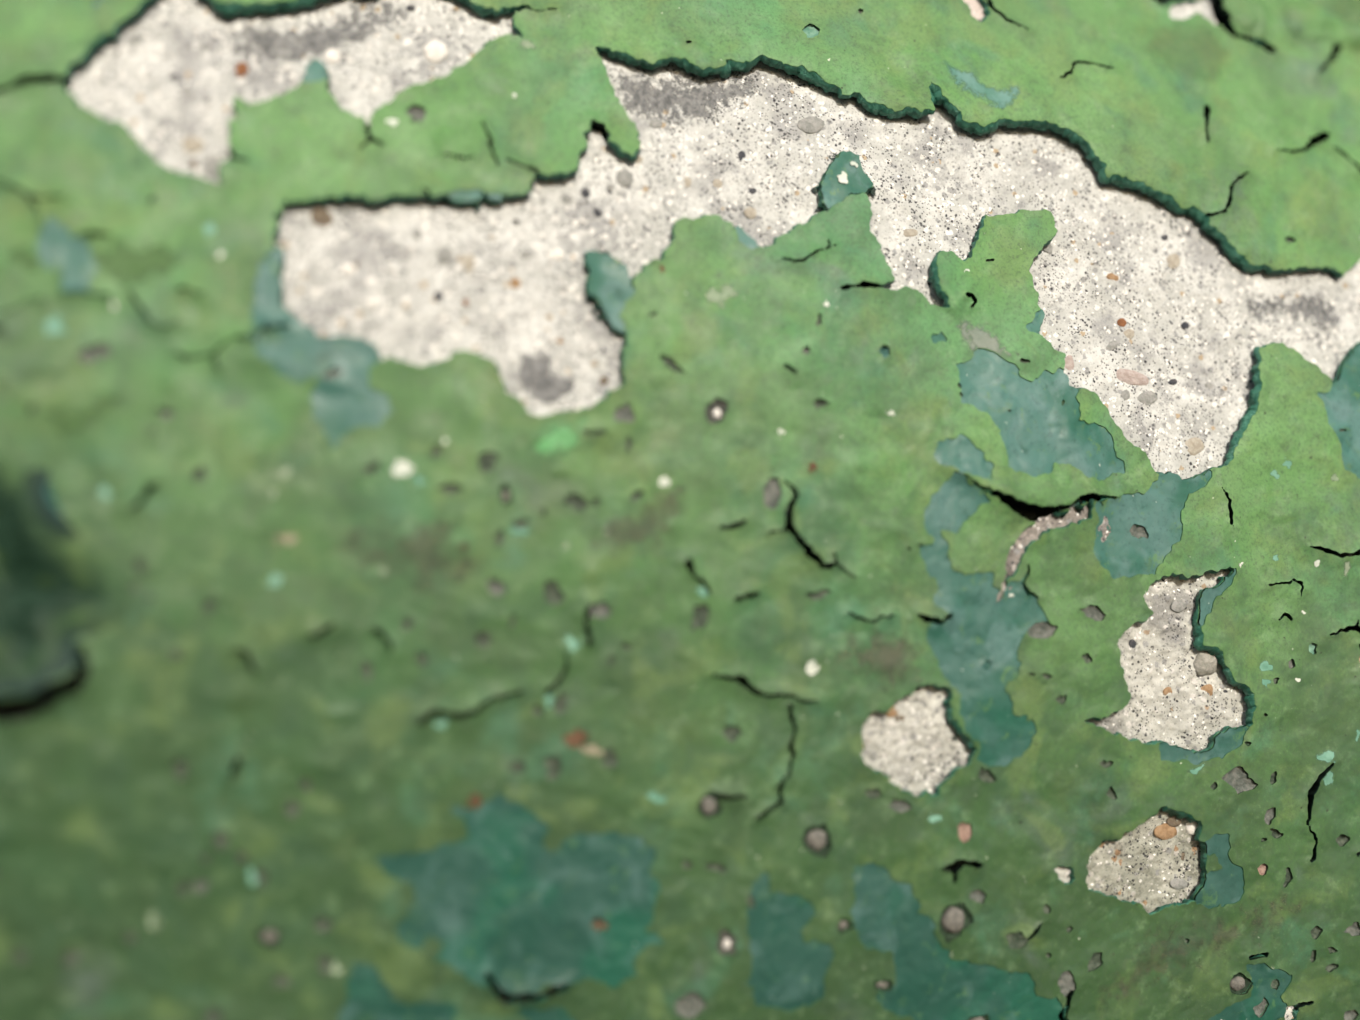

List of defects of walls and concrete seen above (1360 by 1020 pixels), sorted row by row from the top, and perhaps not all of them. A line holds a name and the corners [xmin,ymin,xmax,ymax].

peeling [963,0,991,22]
peeling [1160,0,1216,25]
crack [1210,0,1276,53]
peeling [60,0,530,184]
peeling [242,40,1360,813]
crack [954,471,1117,521]
crack [1222,487,1234,526]
crack [1310,546,1360,558]
crack [1269,578,1304,621]
spalling [958,822,973,843]
crack [1306,763,1334,862]
peeling [1054,806,1268,915]